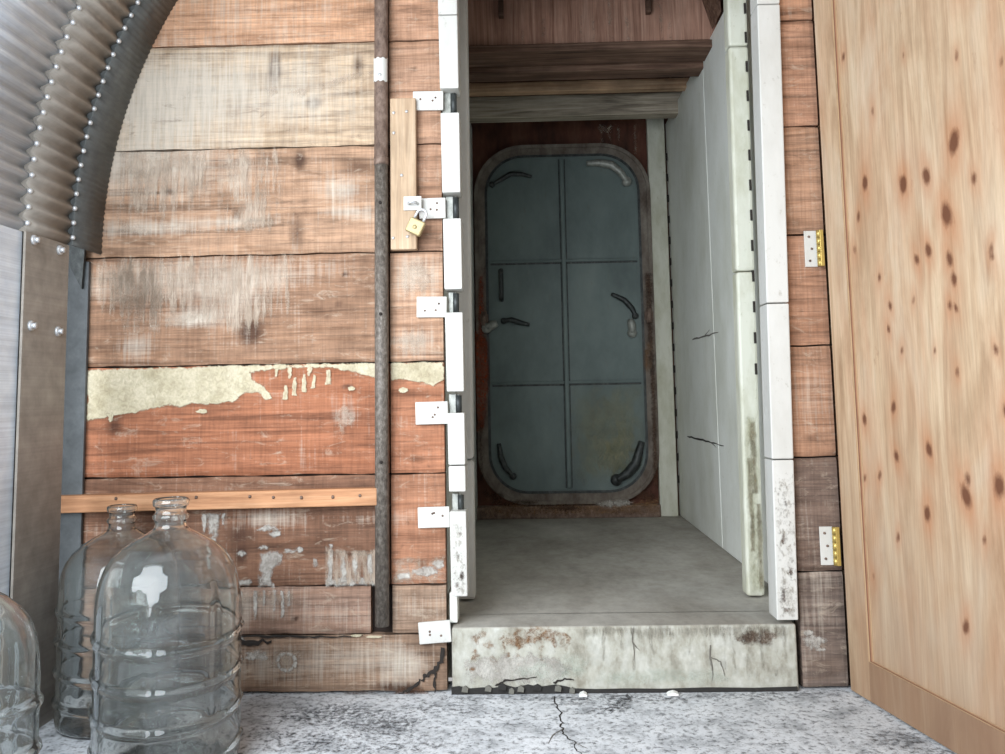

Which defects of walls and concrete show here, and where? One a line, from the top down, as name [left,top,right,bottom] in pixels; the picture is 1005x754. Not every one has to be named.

peeling [87,363,375,422]
peeling [391,362,444,393]
crack [399,647,445,694]
spalling [451,677,798,697]
crack [548,696,588,754]